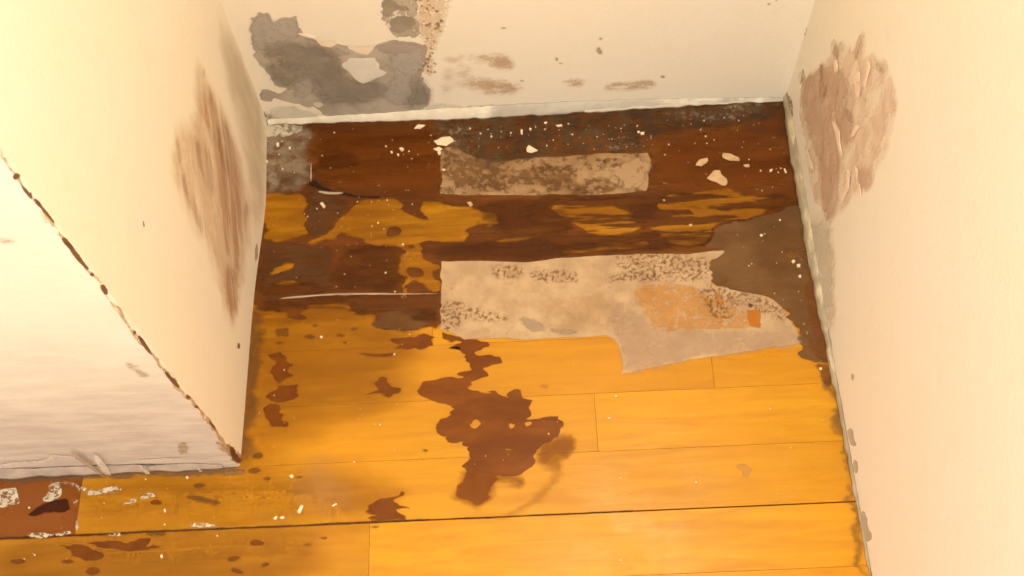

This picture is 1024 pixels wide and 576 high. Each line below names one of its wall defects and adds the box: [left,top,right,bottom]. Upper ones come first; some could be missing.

water stain [214,139,240,261]
peeling [434,128,651,207]
water stain [253,36,894,505]
peeling [440,250,800,374]
spalling [216,442,241,463]